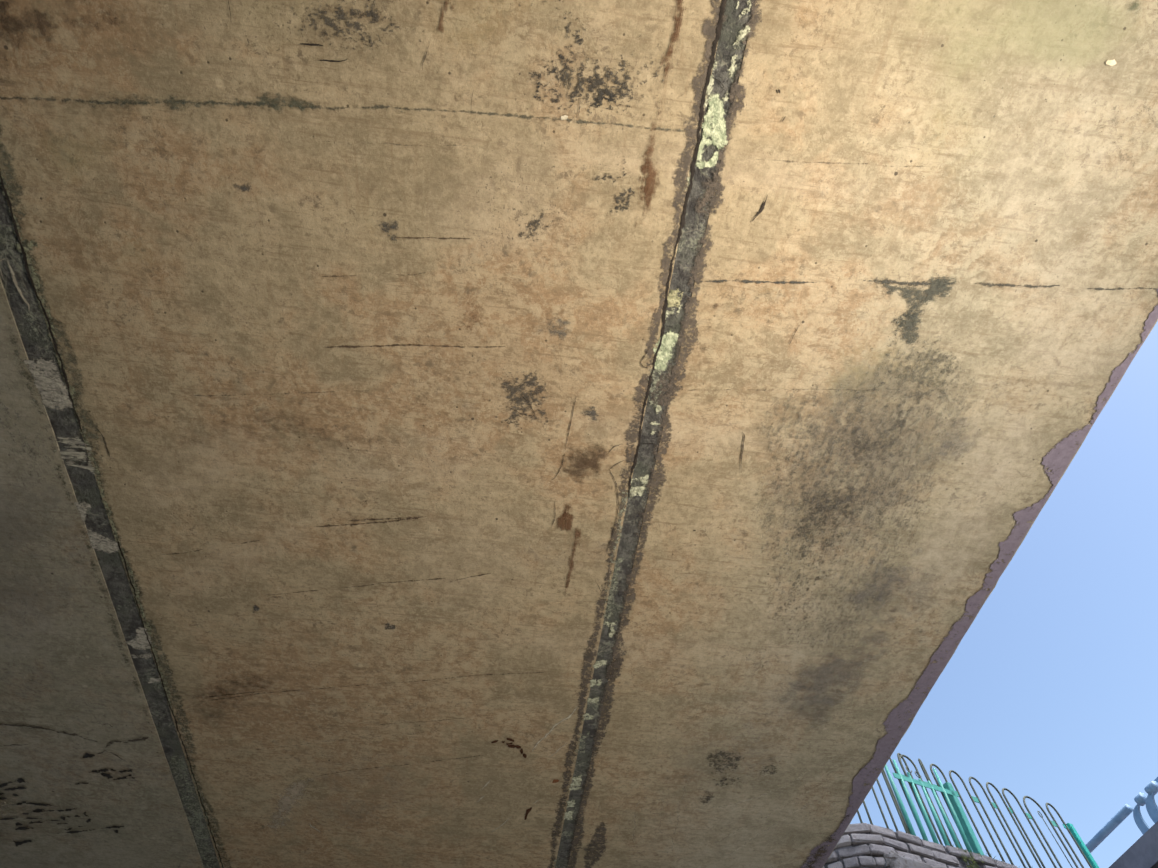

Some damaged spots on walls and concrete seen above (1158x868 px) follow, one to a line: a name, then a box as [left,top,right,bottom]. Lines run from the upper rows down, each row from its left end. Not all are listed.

corrosion [662,0,683,76]
corrosion [642,124,660,210]
water stain [489,369,552,432]
water stain [519,0,762,868]
water stain [0,125,231,868]
corrosion [557,505,581,588]
water stain [793,305,1158,868]
peeling [77,753,135,785]
peeling [0,778,124,847]